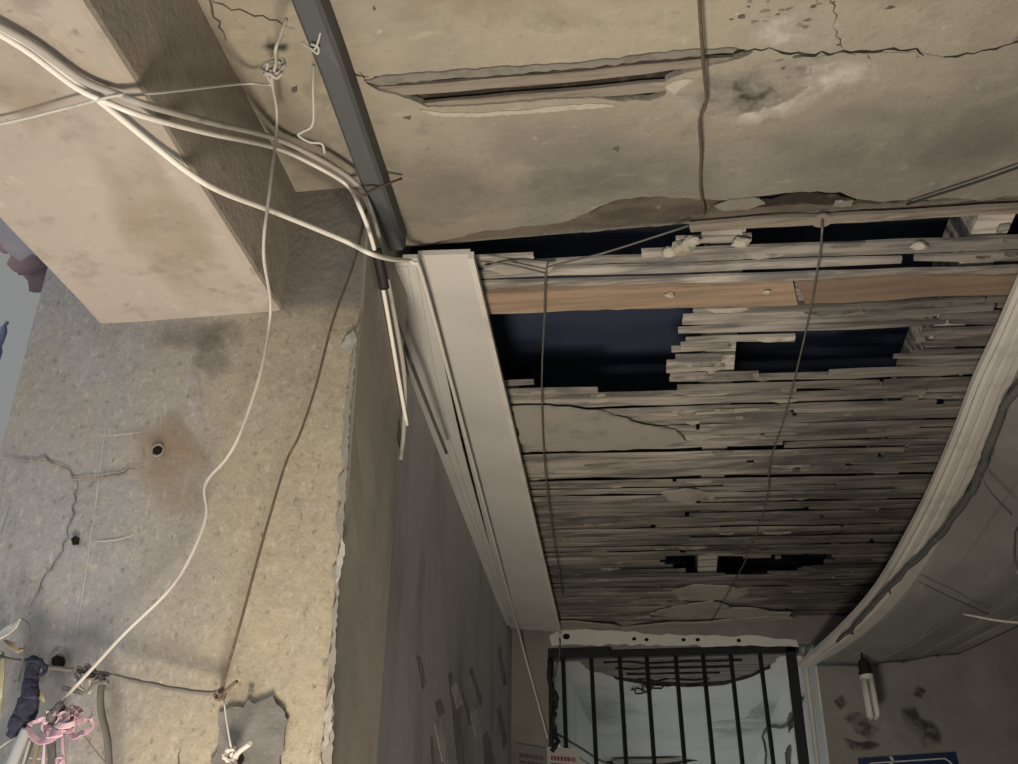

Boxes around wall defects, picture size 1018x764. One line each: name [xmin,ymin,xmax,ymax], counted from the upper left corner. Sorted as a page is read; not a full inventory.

crack [209,0,293,41]
water stain [755,15,807,45]
spalling [729,0,835,29]
crack [738,0,1018,62]
spalling [364,47,745,120]
water stain [696,61,875,123]
crack [3,456,143,607]